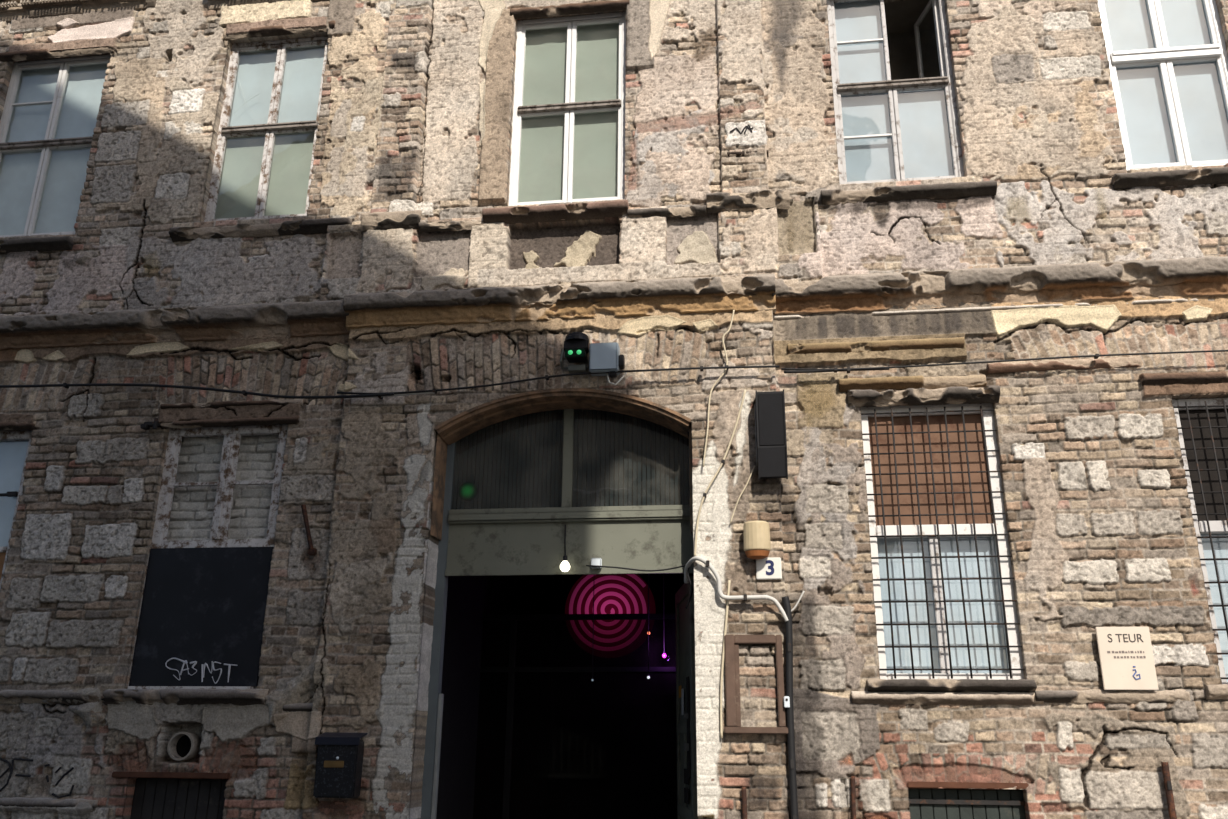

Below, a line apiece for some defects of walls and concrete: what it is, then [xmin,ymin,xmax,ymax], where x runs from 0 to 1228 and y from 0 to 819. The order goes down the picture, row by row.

crack [1040,170,1089,242]
crack [119,200,154,310]
peeling [554,231,602,267]
crack [872,217,940,245]
crack [160,326,587,361]
peeling [616,315,718,338]
peeling [990,304,1122,338]
peeling [1182,305,1228,323]
crack [62,358,96,421]
peeling [107,701,162,741]
peeling [201,701,322,743]
crack [1081,728,1178,808]